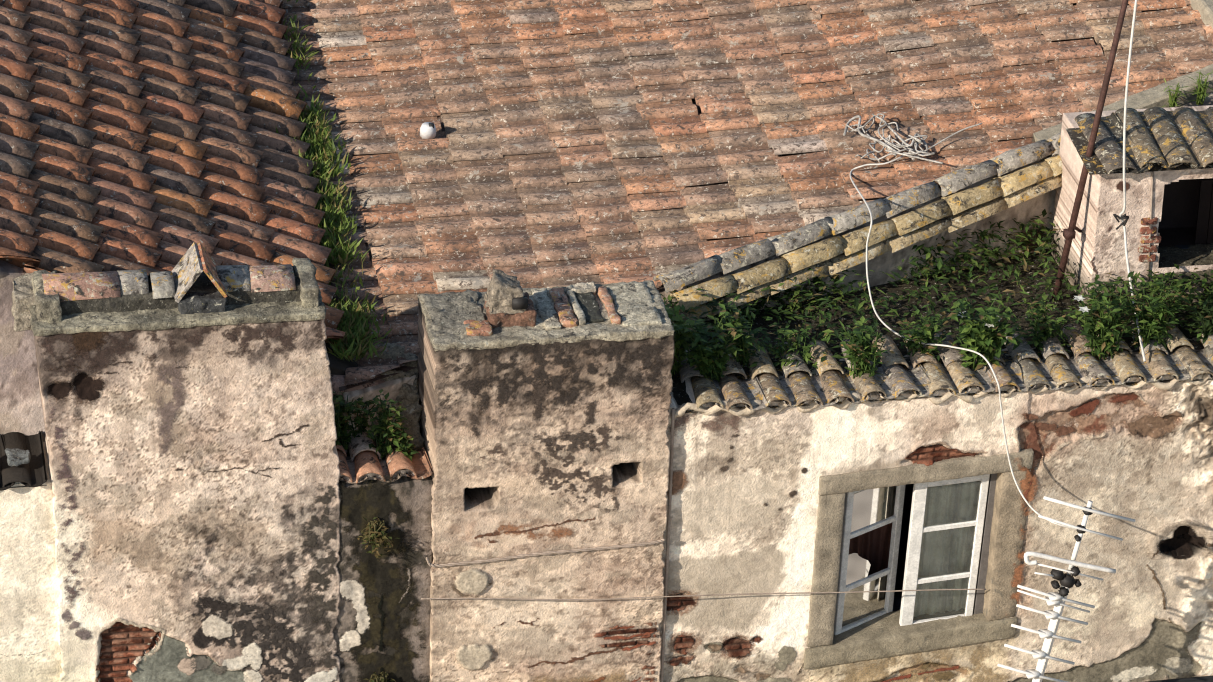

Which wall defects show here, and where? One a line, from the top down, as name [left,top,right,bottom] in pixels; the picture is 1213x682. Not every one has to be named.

damp [42,321,301,456]
crack [175,424,309,478]
damp [531,424,628,512]
spalling [905,442,987,466]
spalling [1015,392,1182,471]
damp [50,407,91,640]
crack [474,517,595,543]
flaking render [75,614,263,682]
damp [191,474,429,682]
peeling [339,580,370,652]
spalling [594,590,797,682]
flaking render [1008,520,1213,682]